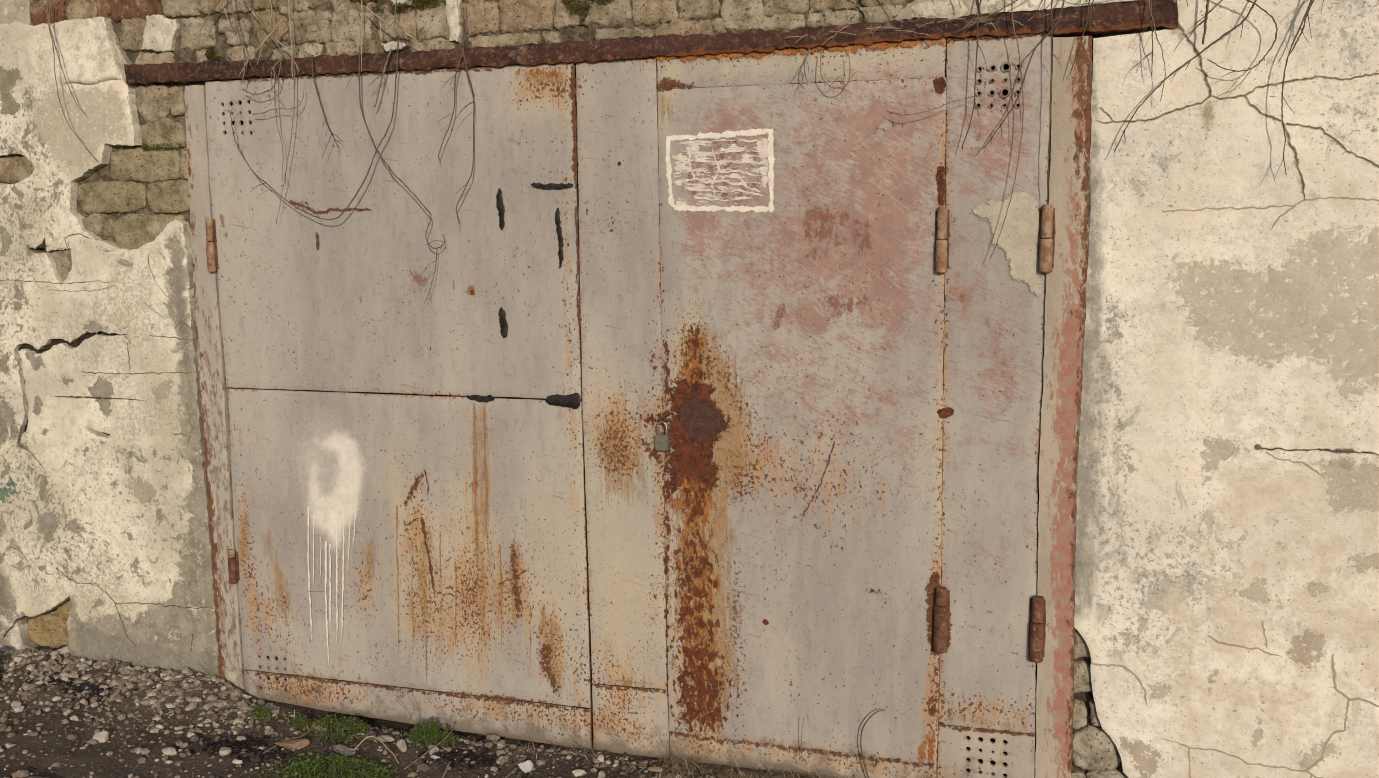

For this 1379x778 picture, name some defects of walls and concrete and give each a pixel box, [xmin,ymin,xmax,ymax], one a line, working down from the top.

spalling [0,0,981,268]
corrosion [655,31,1050,91]
corrosion [933,77,946,94]
spalling [1063,28,1164,36]
crack [1096,21,1379,228]
crack [18,256,197,463]
spalling [26,599,72,648]
corrosion [242,469,590,713]
corrosion [588,308,1036,768]
crack [1260,448,1378,479]
spalling [1072,628,1165,778]
crack [1165,654,1379,778]